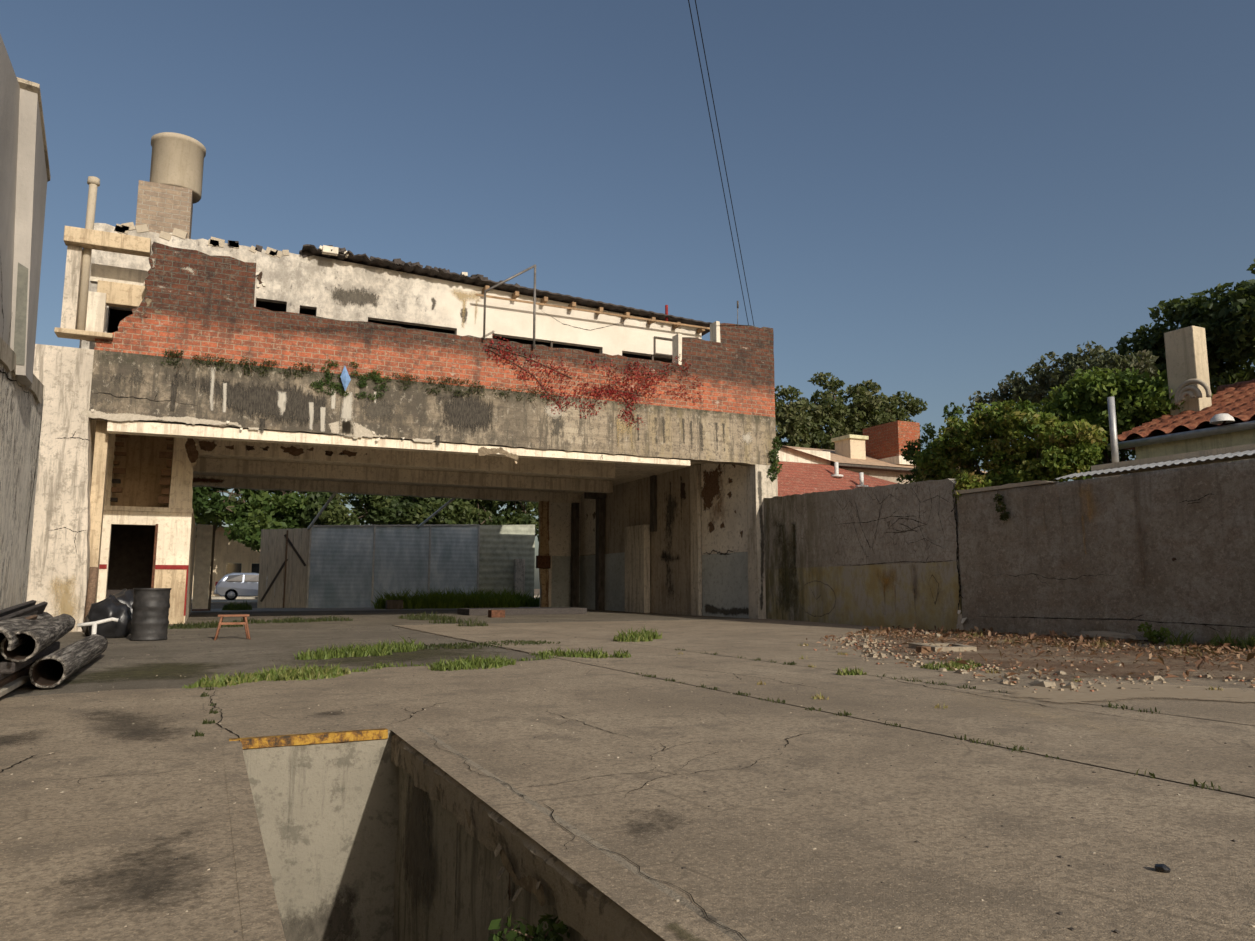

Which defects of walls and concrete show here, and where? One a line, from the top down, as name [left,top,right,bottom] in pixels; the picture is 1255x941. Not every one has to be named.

damp [436,392,493,446]
peeling [679,464,736,532]
damp [705,471,798,616]
crack [206,692,240,741]
crack [391,701,819,941]